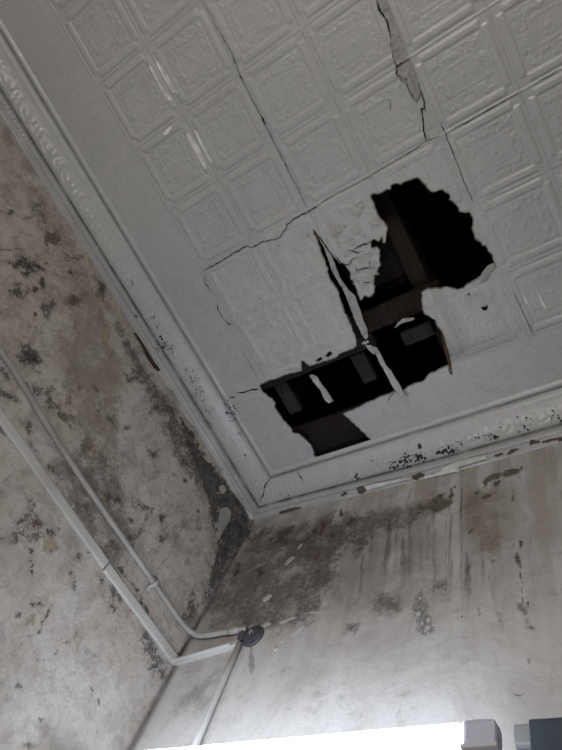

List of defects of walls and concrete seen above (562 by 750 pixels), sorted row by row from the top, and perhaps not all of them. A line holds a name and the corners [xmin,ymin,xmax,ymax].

crack [203,0,521,345]
water stain [33,203,66,246]
water stain [0,248,48,297]
peeling [323,221,377,286]
peeling [478,263,496,280]
water stain [16,343,42,369]
water stain [26,254,429,627]
peeling [365,477,413,491]
peeling [423,455,487,479]
spalling [474,466,523,499]
water stain [12,499,59,574]
water stain [130,609,167,680]